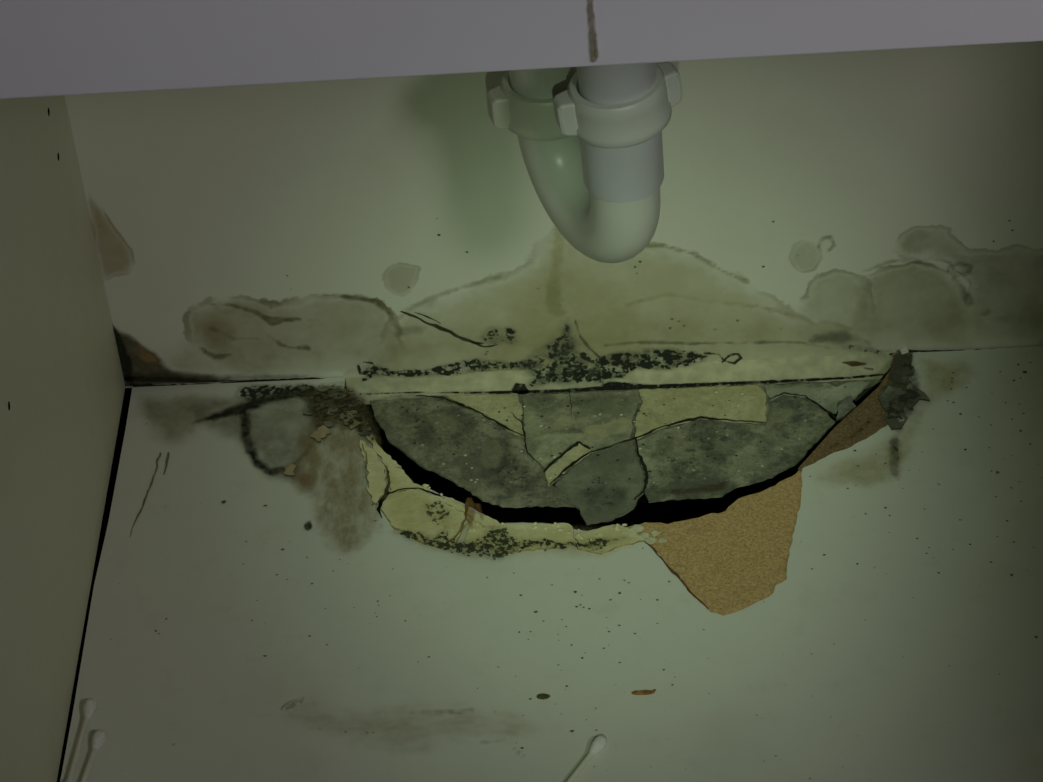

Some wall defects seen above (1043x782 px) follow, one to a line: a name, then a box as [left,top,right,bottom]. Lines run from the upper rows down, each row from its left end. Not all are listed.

water stain [232,300,298,325]
water stain [342,295,400,329]
crack [362,444,440,518]
water stain [113,321,930,545]
crack [416,390,837,500]
spalling [360,354,915,615]
crack [447,502,469,542]